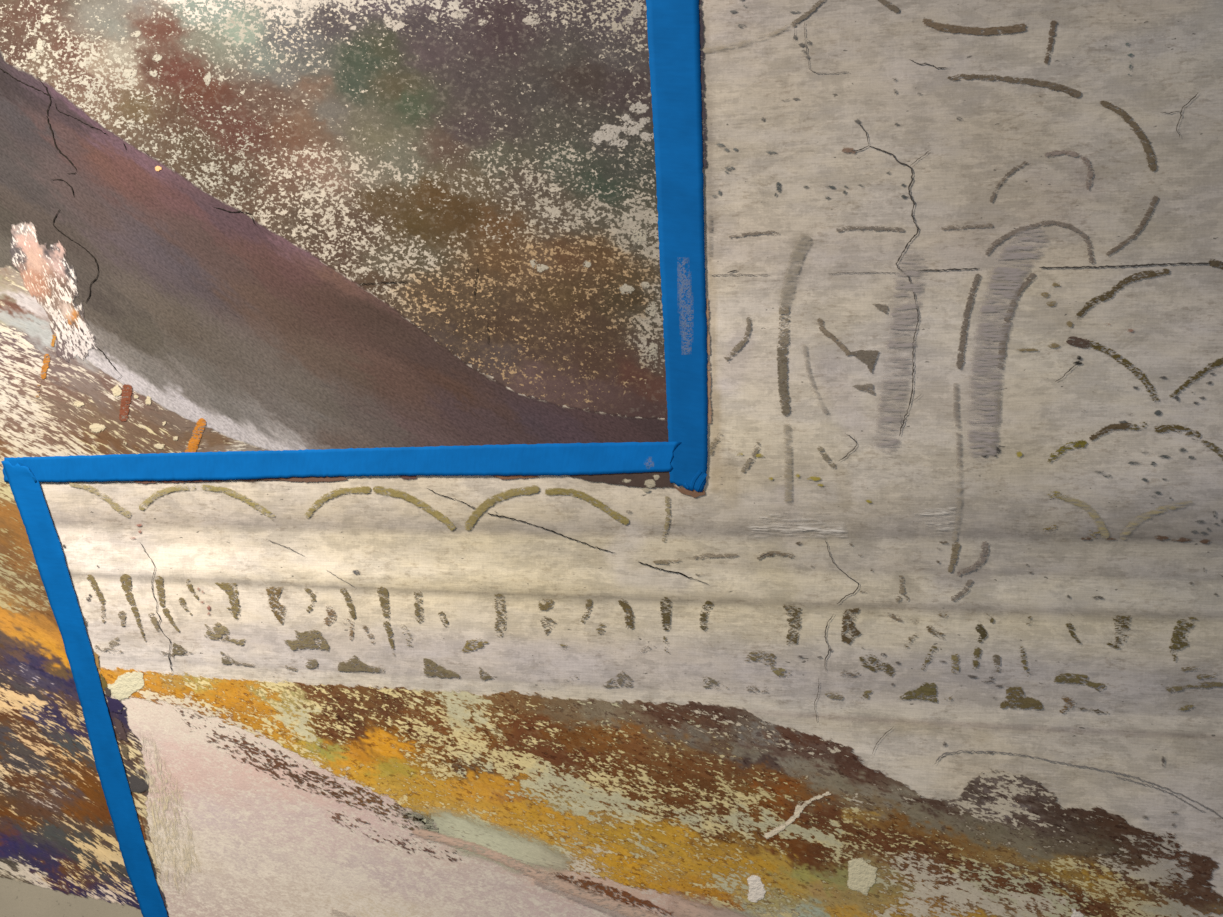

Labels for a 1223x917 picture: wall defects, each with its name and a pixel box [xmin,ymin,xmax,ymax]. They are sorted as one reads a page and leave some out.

crack [0,68,148,302]
peeling [0,0,668,420]
crack [852,123,927,436]
peeling [89,423,106,433]
crack [141,544,172,672]
crack [427,488,707,584]
peeling [94,652,1223,917]